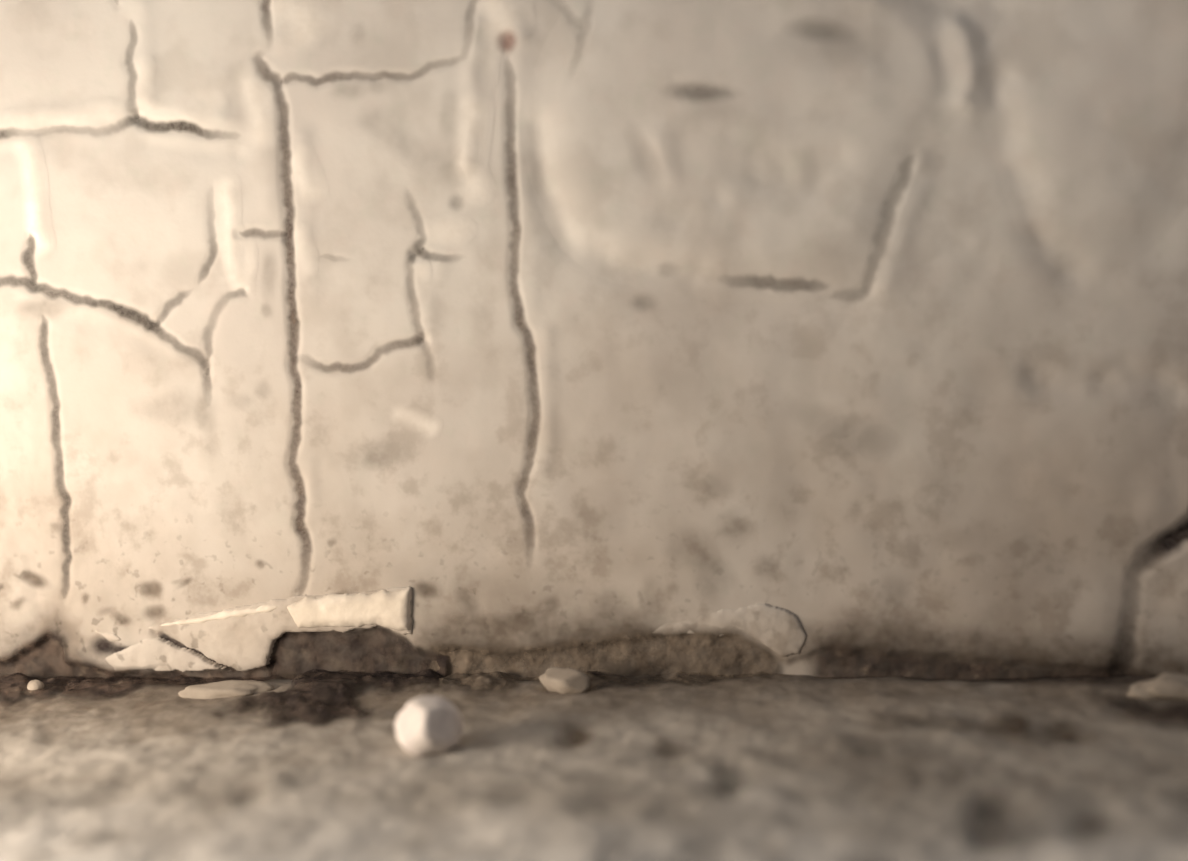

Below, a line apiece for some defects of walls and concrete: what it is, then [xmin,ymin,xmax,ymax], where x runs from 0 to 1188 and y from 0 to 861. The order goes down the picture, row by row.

crack [131,118,203,135]
crack [508,160,518,232]
crack [7,239,163,334]
crack [281,106,310,552]
crack [513,290,537,412]
crack [43,327,71,575]
crack [1151,522,1188,554]
peeling [95,586,412,672]
peeling [652,603,807,657]